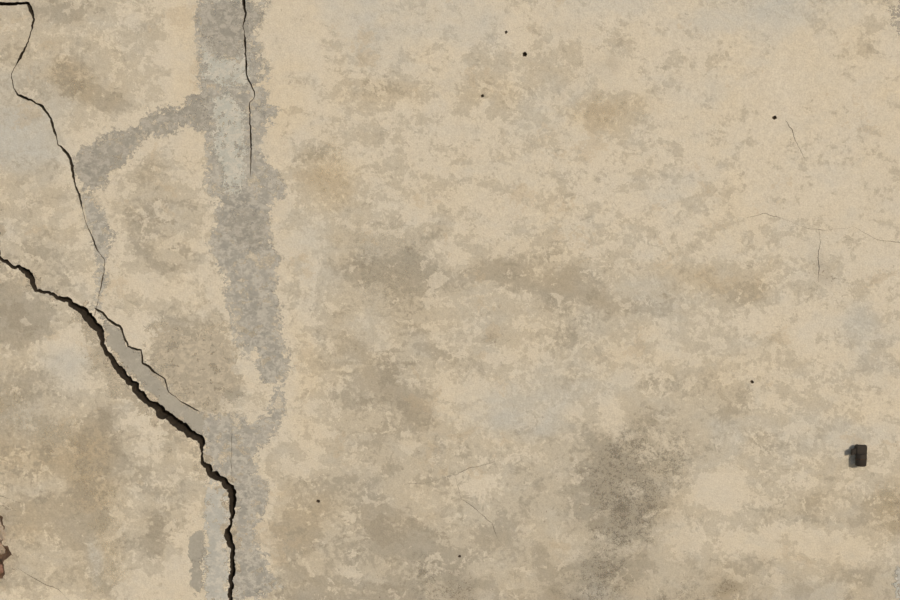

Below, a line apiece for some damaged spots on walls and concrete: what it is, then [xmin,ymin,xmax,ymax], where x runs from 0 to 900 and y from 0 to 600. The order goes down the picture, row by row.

crack [242,0,255,176]
crack [0,2,241,600]
flaking render [0,504,16,580]